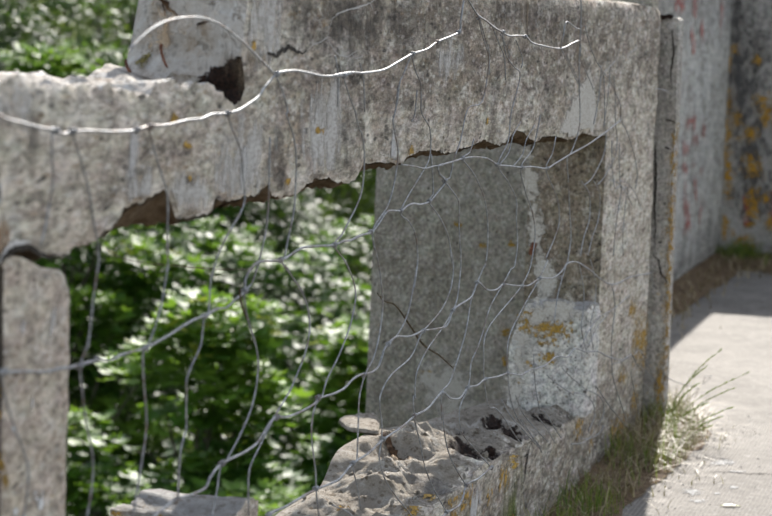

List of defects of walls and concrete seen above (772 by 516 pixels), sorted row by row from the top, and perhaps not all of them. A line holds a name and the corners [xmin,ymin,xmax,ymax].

spalling [197,40,265,105]
crack [267,0,374,78]
crack [668,29,676,84]
peeling [285,78,341,197]
peeling [360,69,598,408]
crack [653,144,671,285]